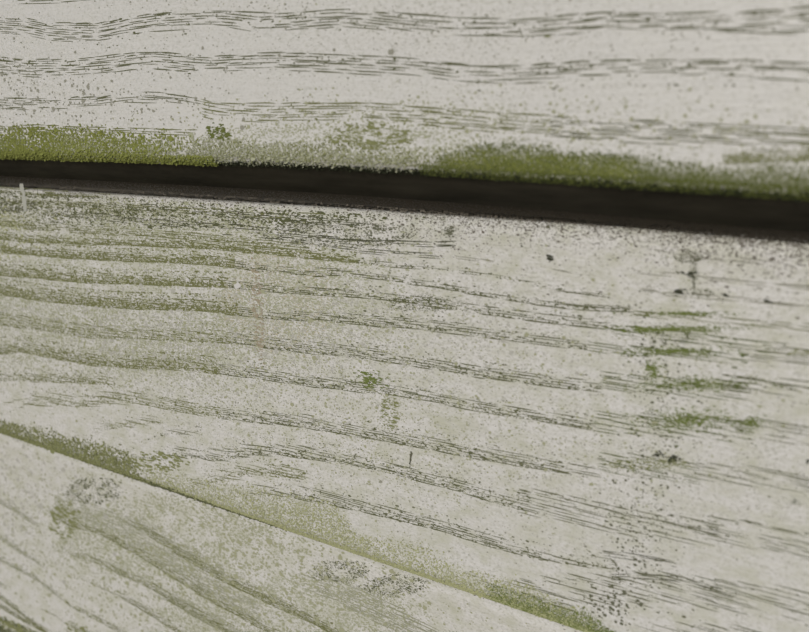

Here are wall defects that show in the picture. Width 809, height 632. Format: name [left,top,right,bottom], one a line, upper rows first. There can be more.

leakage [0,0,808,160]